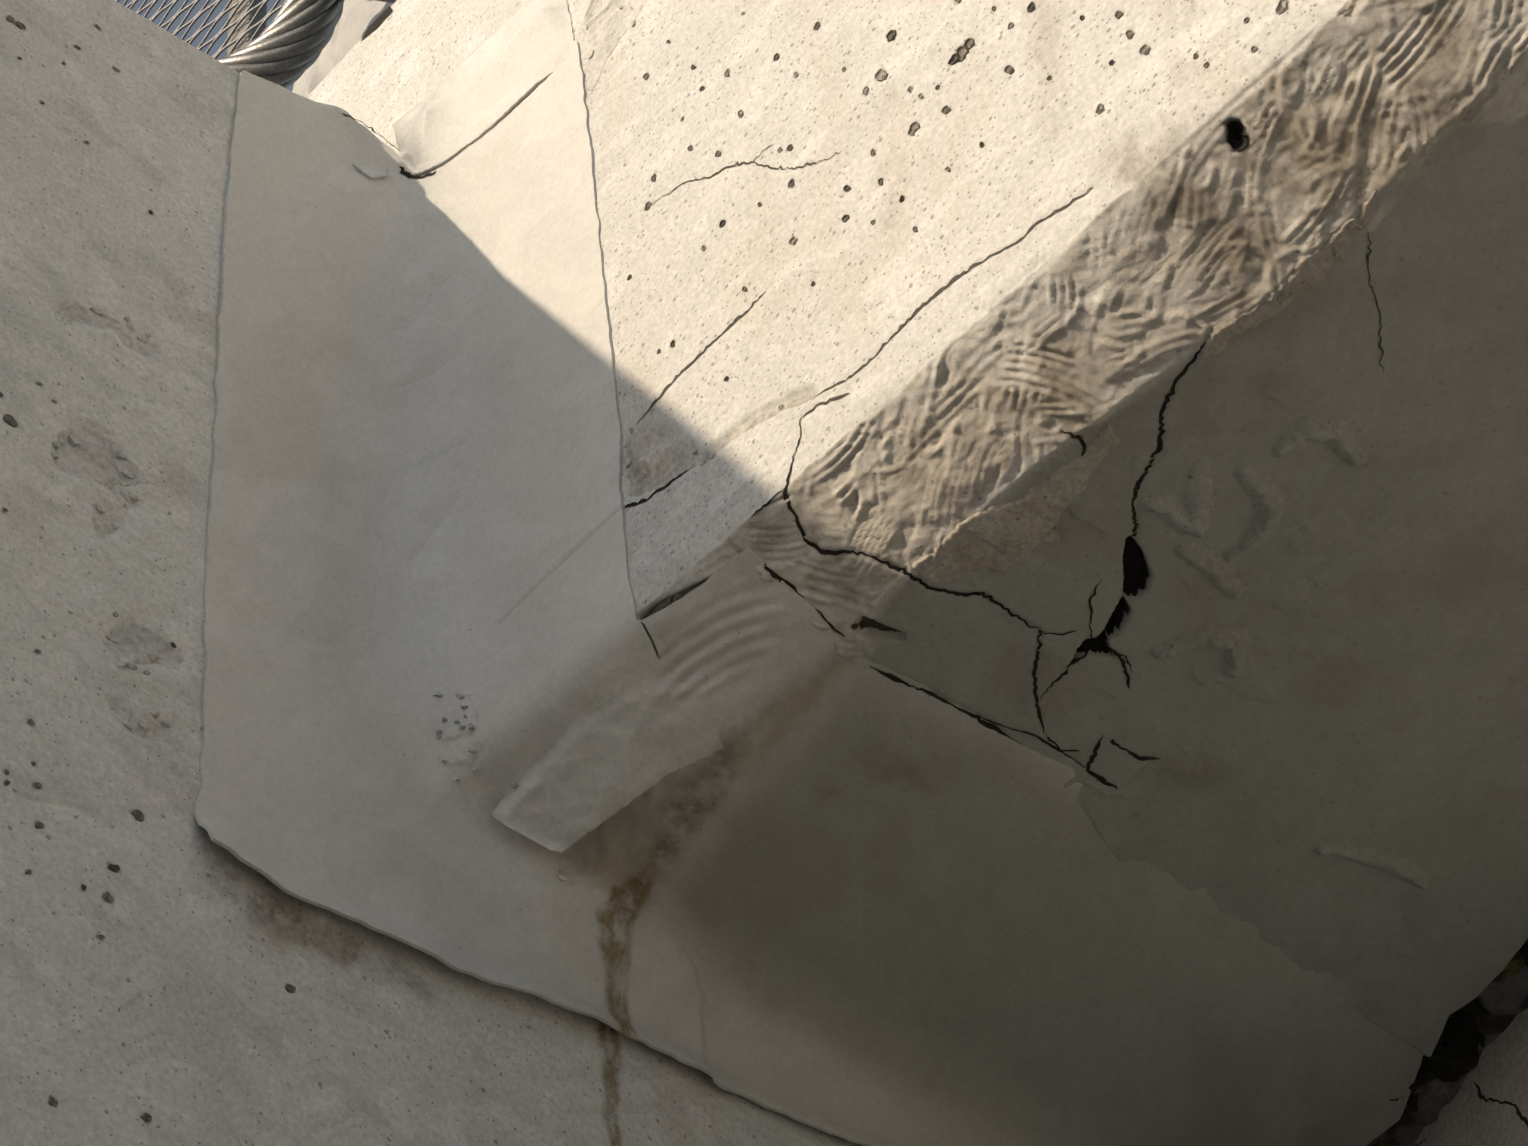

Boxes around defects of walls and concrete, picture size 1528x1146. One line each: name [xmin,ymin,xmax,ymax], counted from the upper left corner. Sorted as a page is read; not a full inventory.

crack [637,292,765,424]
crack [625,466,695,508]
crack [751,187,1206,789]
rust [598,879,647,1098]
crack [1473,1081,1528,1127]